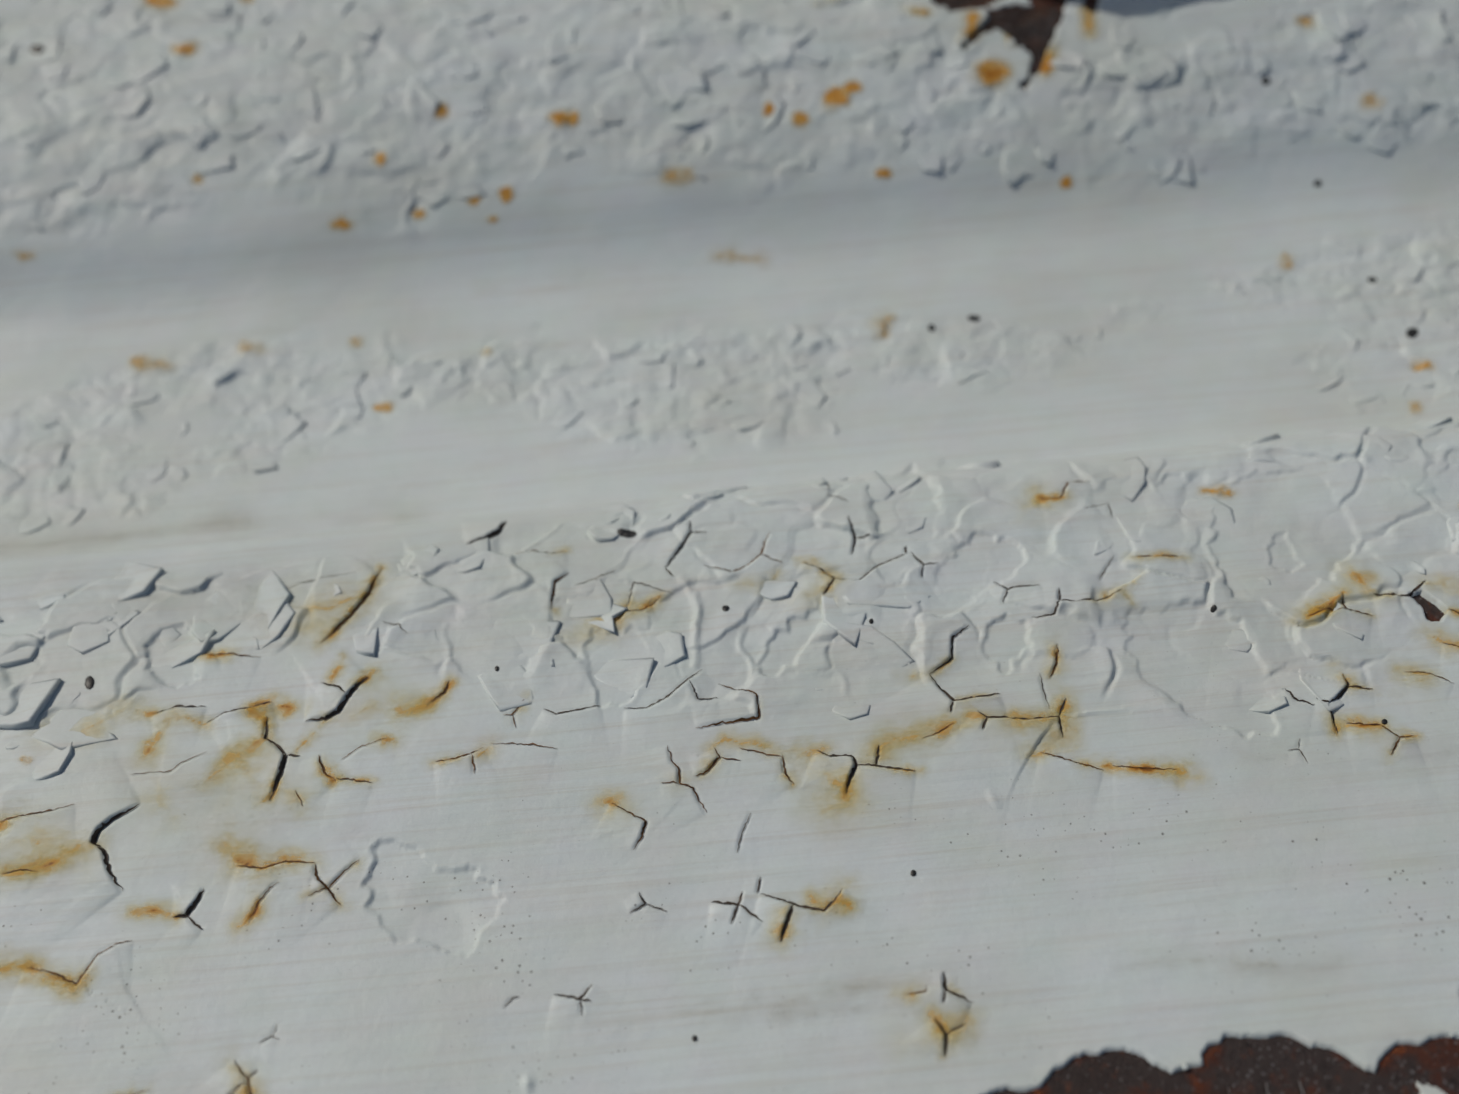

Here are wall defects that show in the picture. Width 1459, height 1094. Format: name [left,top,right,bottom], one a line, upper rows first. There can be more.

corrosion [824,82,862,105]
corrosion [977,60,1010,86]
peeling [932,0,1098,97]
crack [466,484,938,621]
crack [90,701,384,891]
corrosion [214,699,296,774]
crack [306,677,368,721]
crack [634,555,1184,810]
corrosion [1084,763,1186,774]
corrosion [242,900,261,926]
crack [712,813,842,942]
peeling [992,1033,1459,1094]